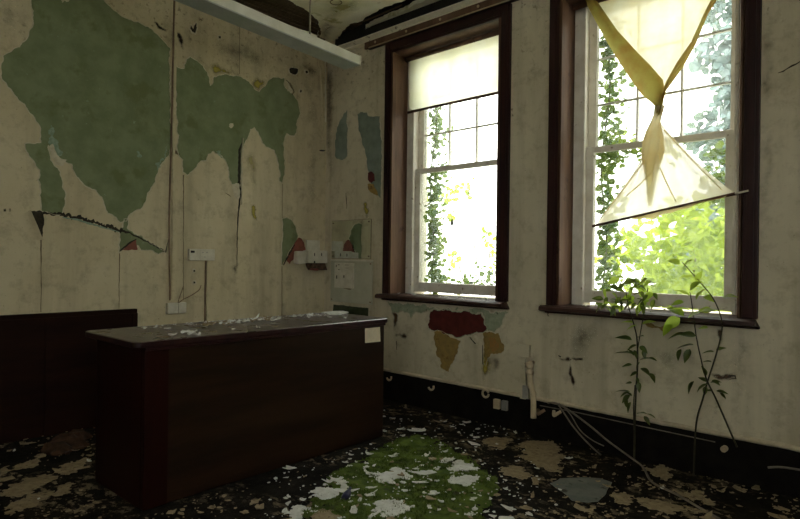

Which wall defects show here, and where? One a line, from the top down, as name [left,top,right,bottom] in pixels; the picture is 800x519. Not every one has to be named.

crack [31,175,184,299]
peeling [0,0,302,255]
crack [226,138,243,254]
peeling [281,217,306,266]
peeling [334,109,383,199]
peeling [388,301,509,377]